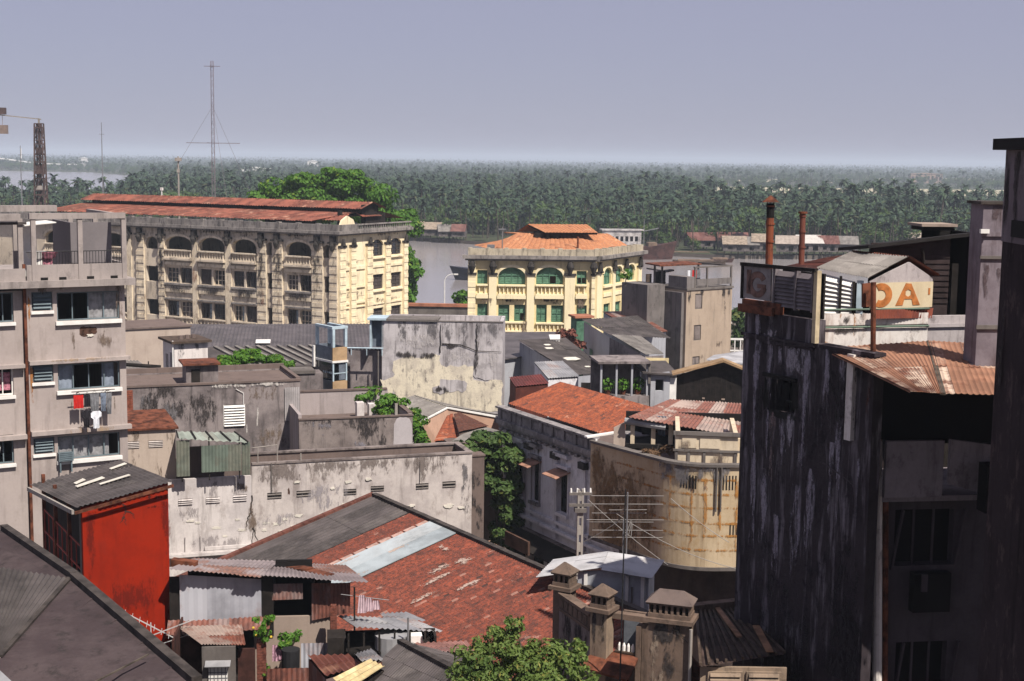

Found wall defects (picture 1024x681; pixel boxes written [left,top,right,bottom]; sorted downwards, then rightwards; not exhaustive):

water stain [396,321,500,375]
water stain [212,382,283,445]
flaking render [380,354,503,445]
water stain [750,314,815,571]
water stain [823,349,860,519]
water stain [162,501,197,551]
water stain [193,536,236,547]
crack [246,495,258,541]
water stain [232,455,482,531]
corrosion [615,462,739,552]
water stain [752,579,809,681]